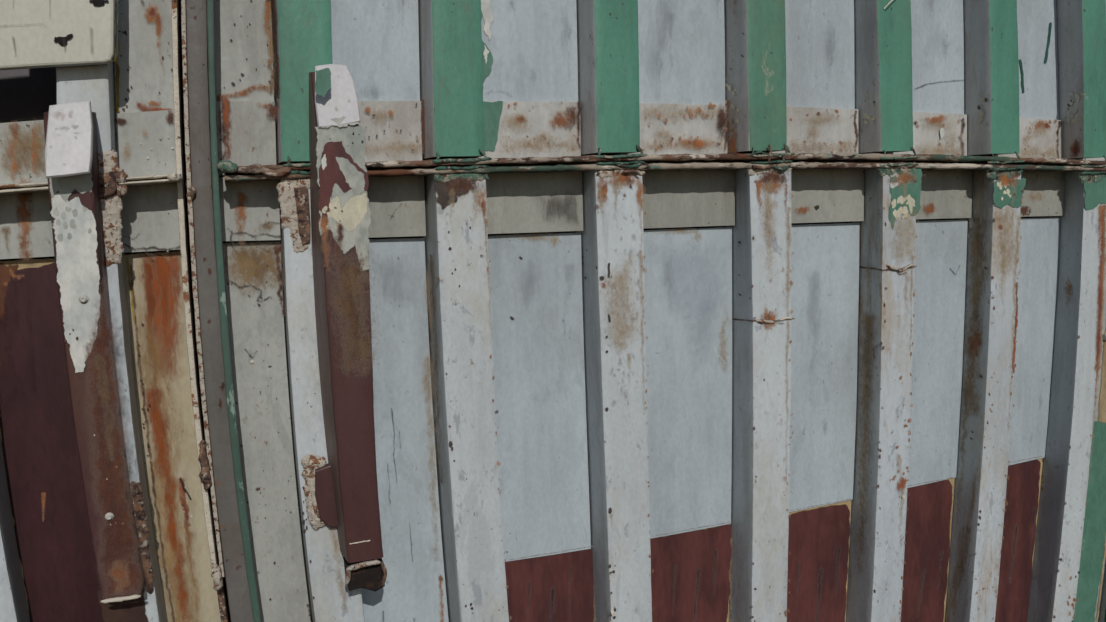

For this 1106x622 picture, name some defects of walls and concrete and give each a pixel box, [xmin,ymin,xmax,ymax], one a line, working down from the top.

peeling [49,172,117,373]
rust [115,0,239,622]
rust [216,0,280,160]
rust [225,245,286,315]
peeling [318,116,369,241]
rust [446,177,488,242]
peeling [481,0,494,63]
peeling [885,173,915,226]
rust [961,217,995,457]
rust [987,174,1041,378]
rust [1095,203,1106,405]
rust [87,296,142,595]